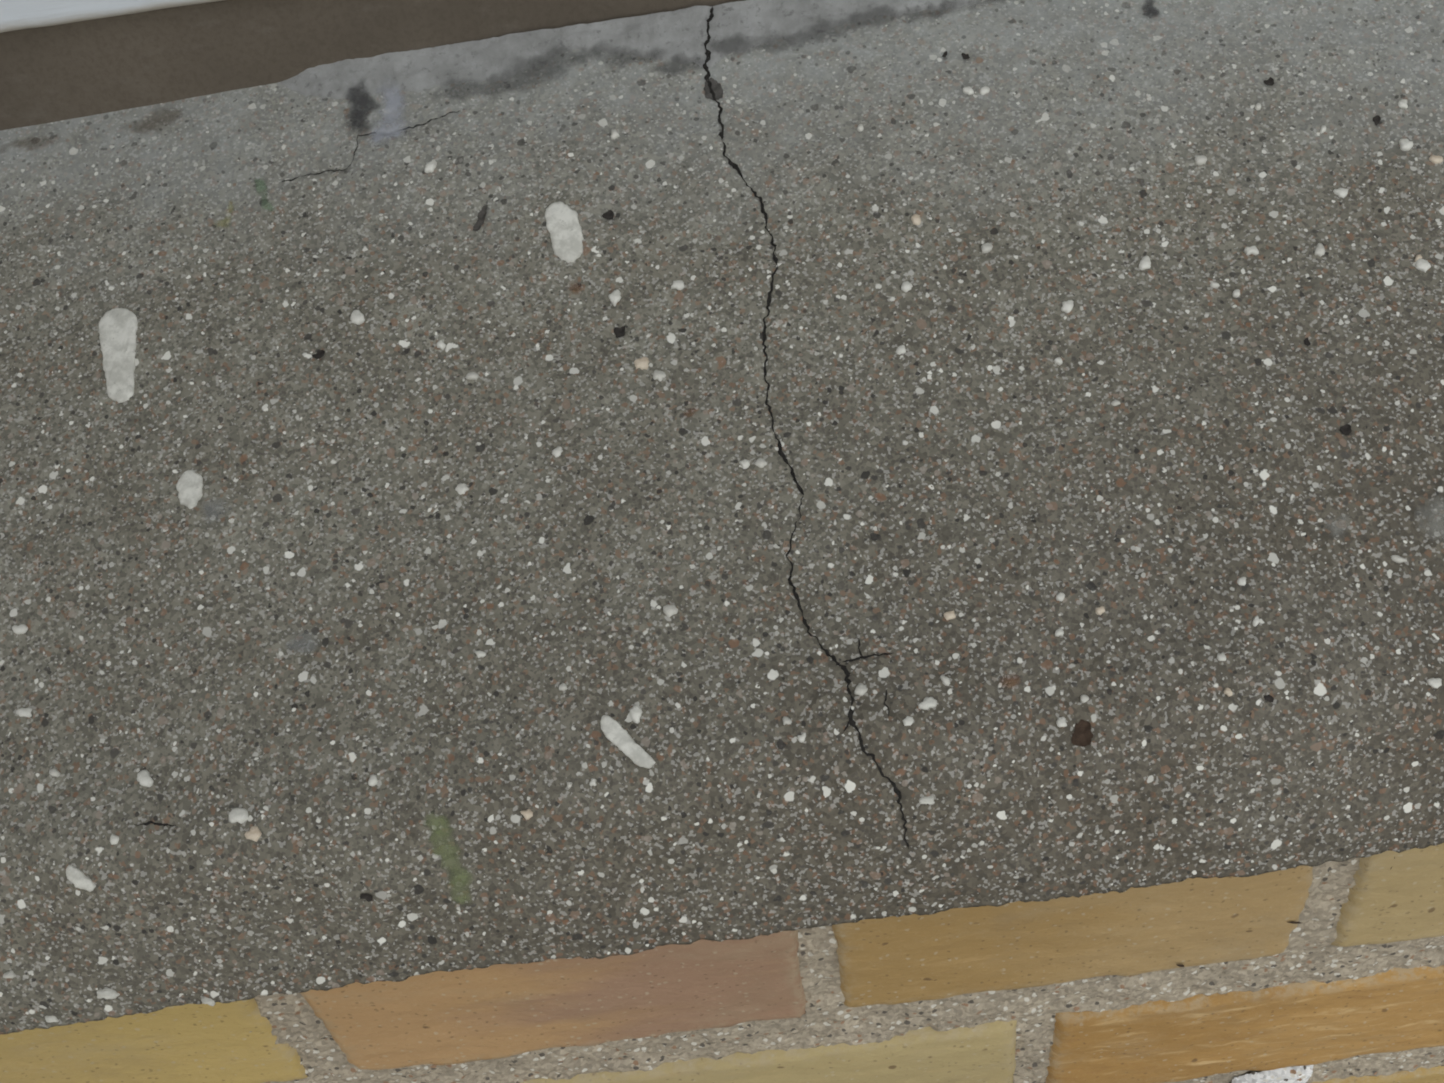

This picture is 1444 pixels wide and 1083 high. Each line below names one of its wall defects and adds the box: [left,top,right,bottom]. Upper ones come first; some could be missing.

crack [703,5,909,849]